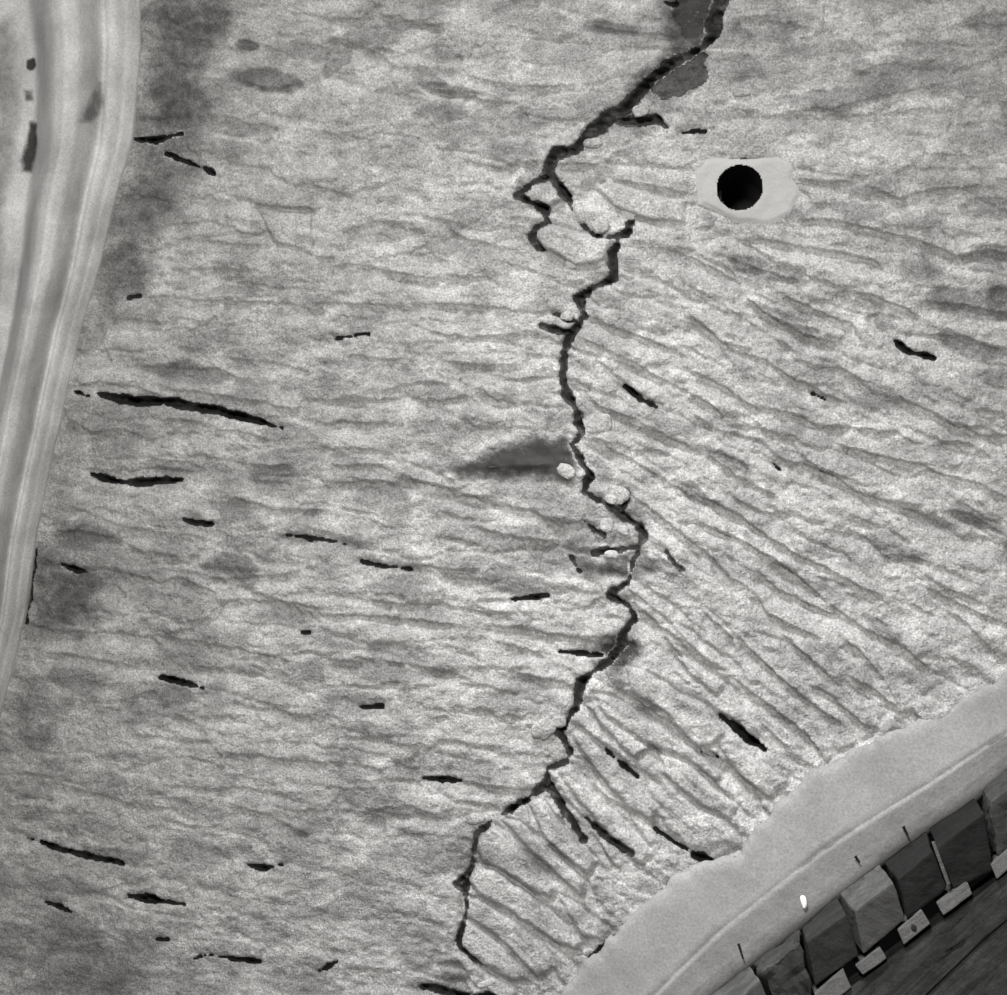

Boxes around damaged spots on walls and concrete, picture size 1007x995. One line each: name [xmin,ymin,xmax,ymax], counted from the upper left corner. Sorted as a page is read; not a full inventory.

crack [419,0,729,995]
crack [732,88,751,97]